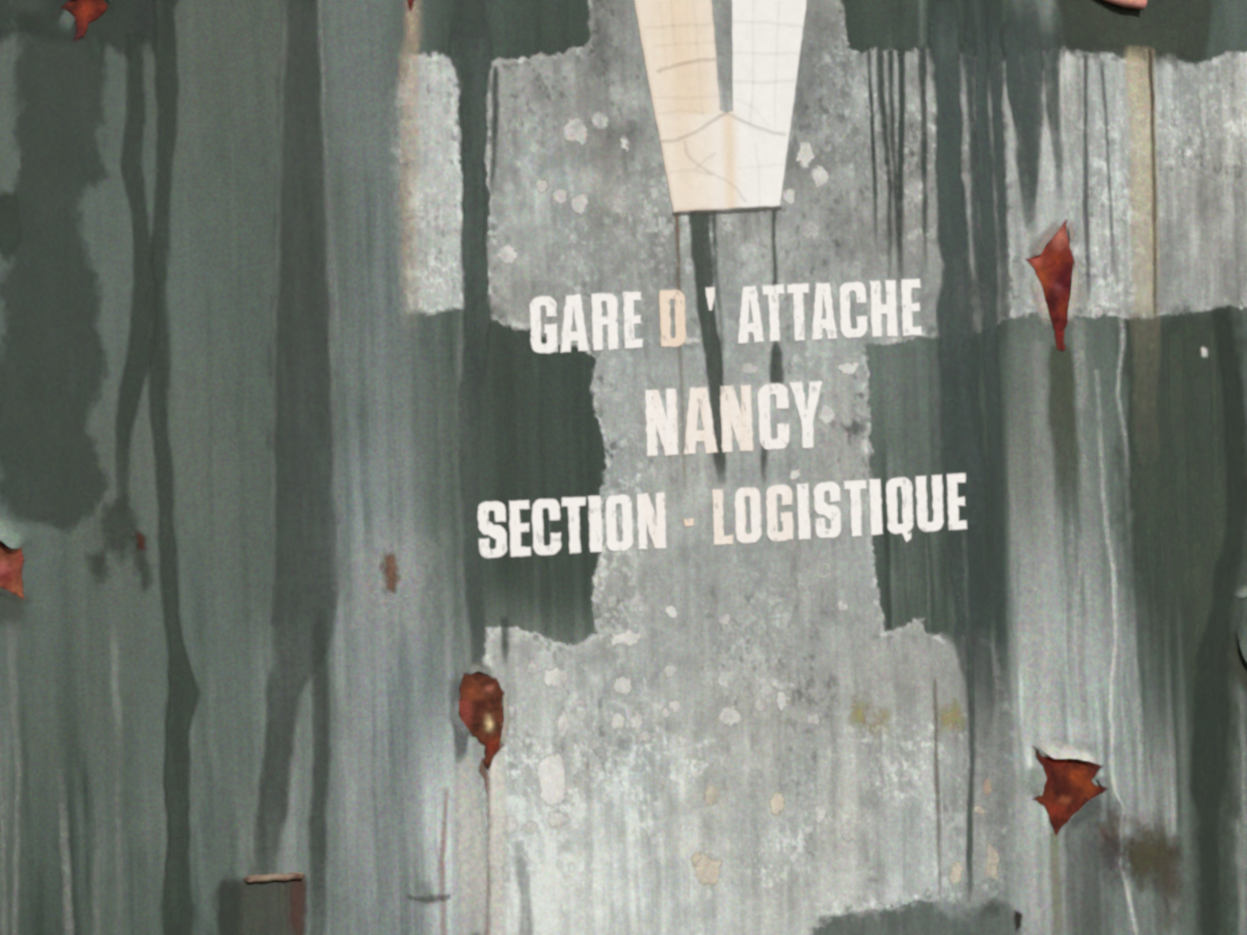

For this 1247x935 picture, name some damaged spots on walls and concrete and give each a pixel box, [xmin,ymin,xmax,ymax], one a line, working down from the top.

peeling [398,52,465,315]
peeling [959,46,1247,351]
damp [0,0,198,935]
peeling [451,0,1011,935]
peeling [1239,616,1247,662]